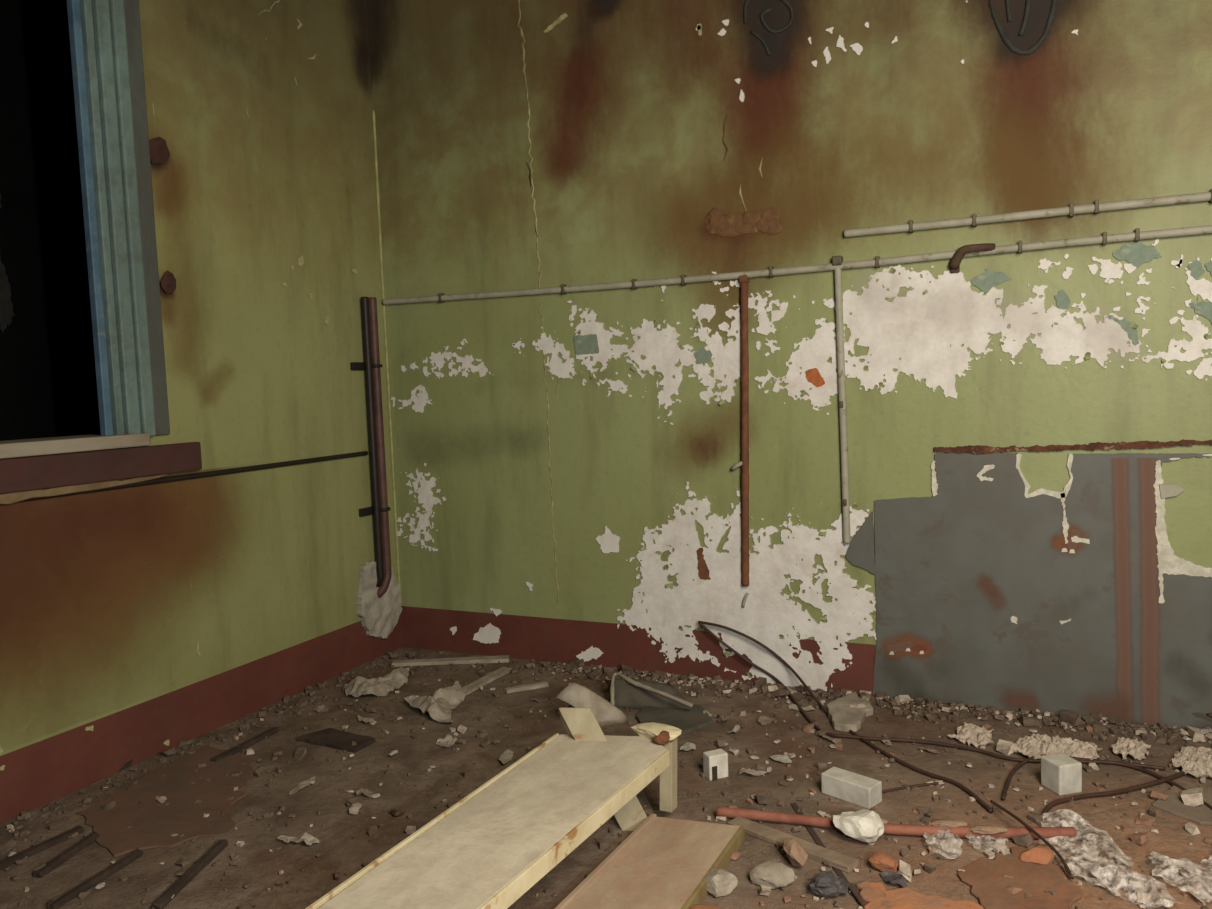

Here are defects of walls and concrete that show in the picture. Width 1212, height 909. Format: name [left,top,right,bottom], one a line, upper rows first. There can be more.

peeling [544,13,568,33]
corrosion [665,0,831,305]
peeling [808,27,863,67]
corrosion [978,0,1074,203]
peeling [391,339,491,413]
peeling [512,239,1212,425]
corrosion [0,470,229,682]
peeling [397,463,446,551]
peeling [596,482,876,691]
peeling [977,465,995,481]
corrosion [934,439,1212,726]
peeling [1061,493,1090,544]